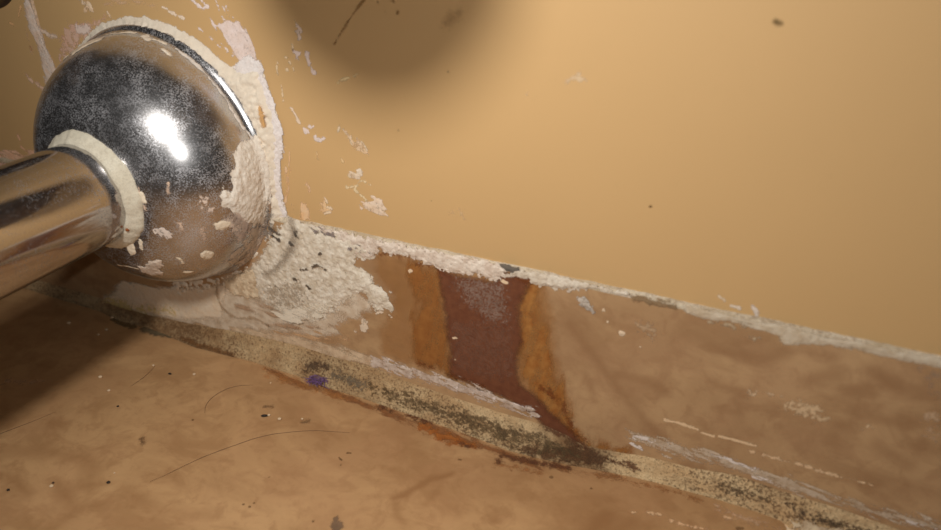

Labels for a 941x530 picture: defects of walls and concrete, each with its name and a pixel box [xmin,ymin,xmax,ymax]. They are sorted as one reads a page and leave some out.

peeling [284,23,317,75]
peeling [312,225,629,296]
damp [106,298,233,357]
damp [234,303,349,342]
rust [380,253,632,453]
damp [303,360,638,472]
mould [717,481,870,530]